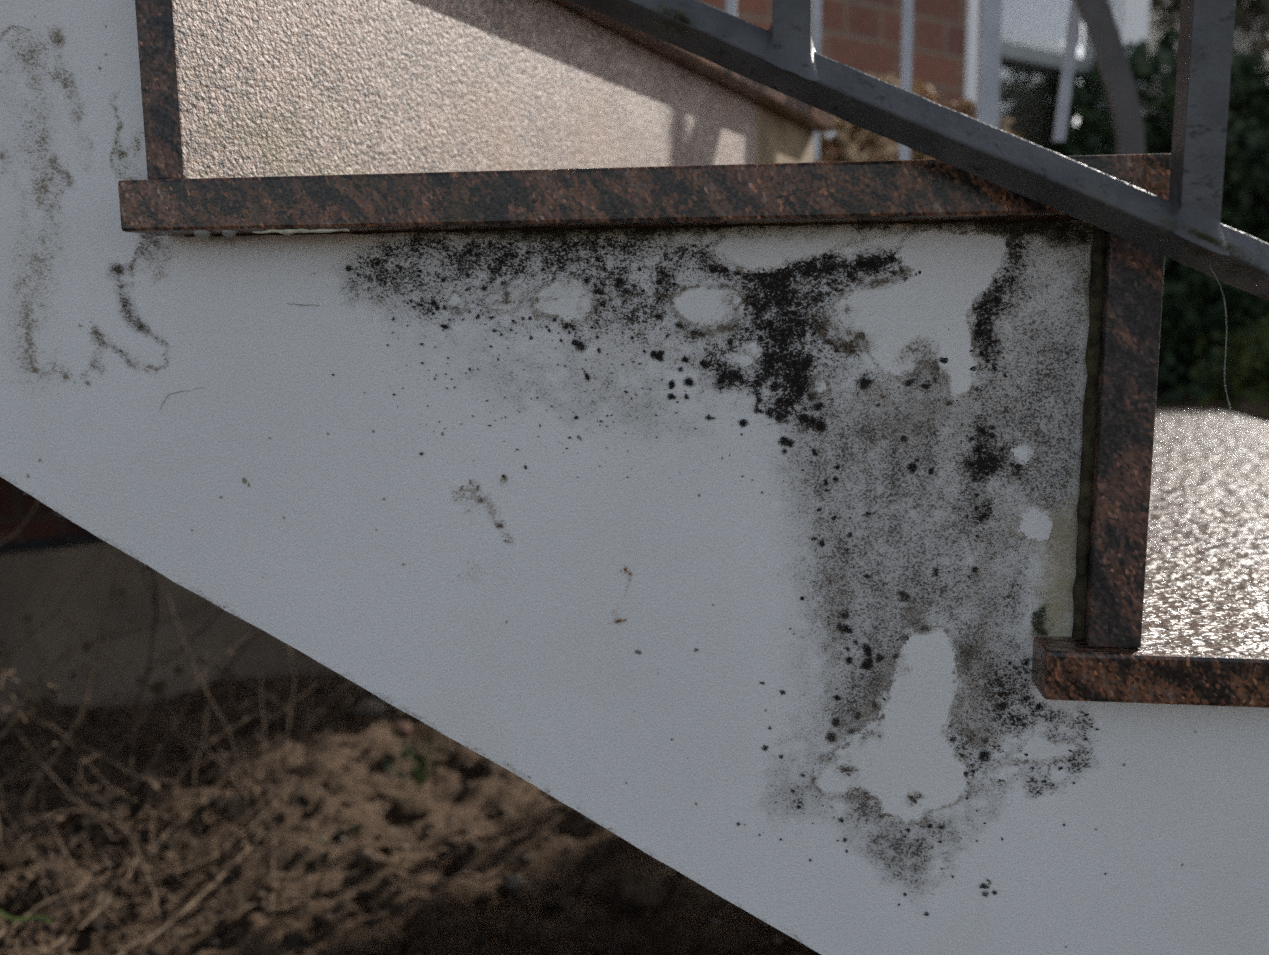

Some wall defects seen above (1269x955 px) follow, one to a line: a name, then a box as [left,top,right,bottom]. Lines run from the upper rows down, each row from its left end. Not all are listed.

water stain [0,25,170,386]
water stain [343,224,1099,906]